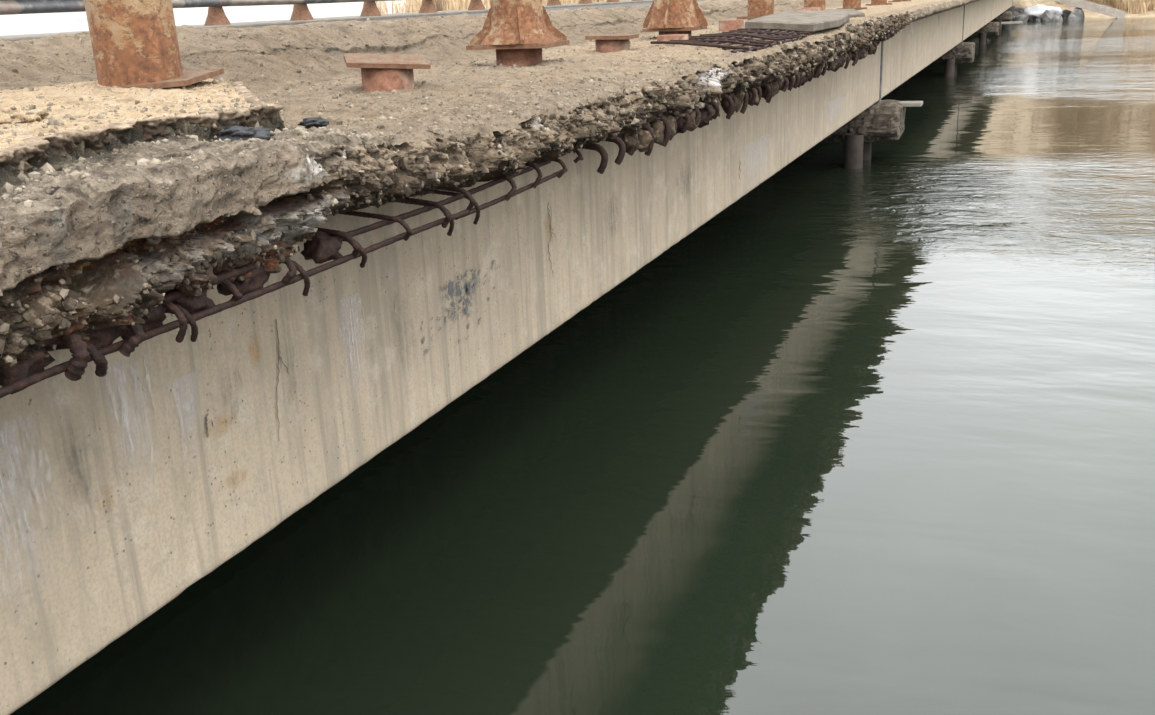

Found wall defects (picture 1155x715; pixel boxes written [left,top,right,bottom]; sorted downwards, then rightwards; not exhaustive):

crack [275,319,288,437]
spalling [0,11,912,398]